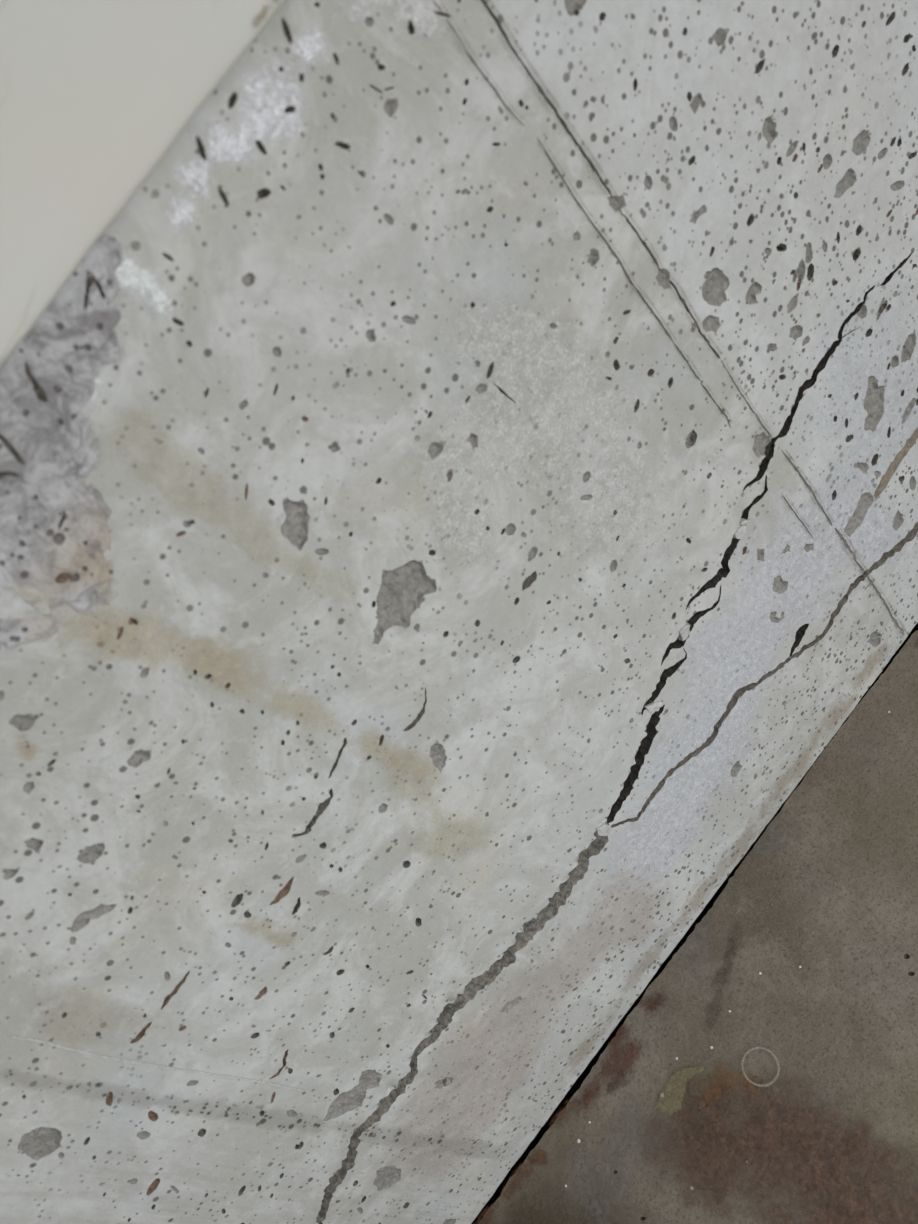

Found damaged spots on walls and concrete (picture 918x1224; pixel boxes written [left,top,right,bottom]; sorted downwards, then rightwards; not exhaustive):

spalling [0,235,124,648]
spalling [373,560,437,644]
crack [316,252,918,1224]